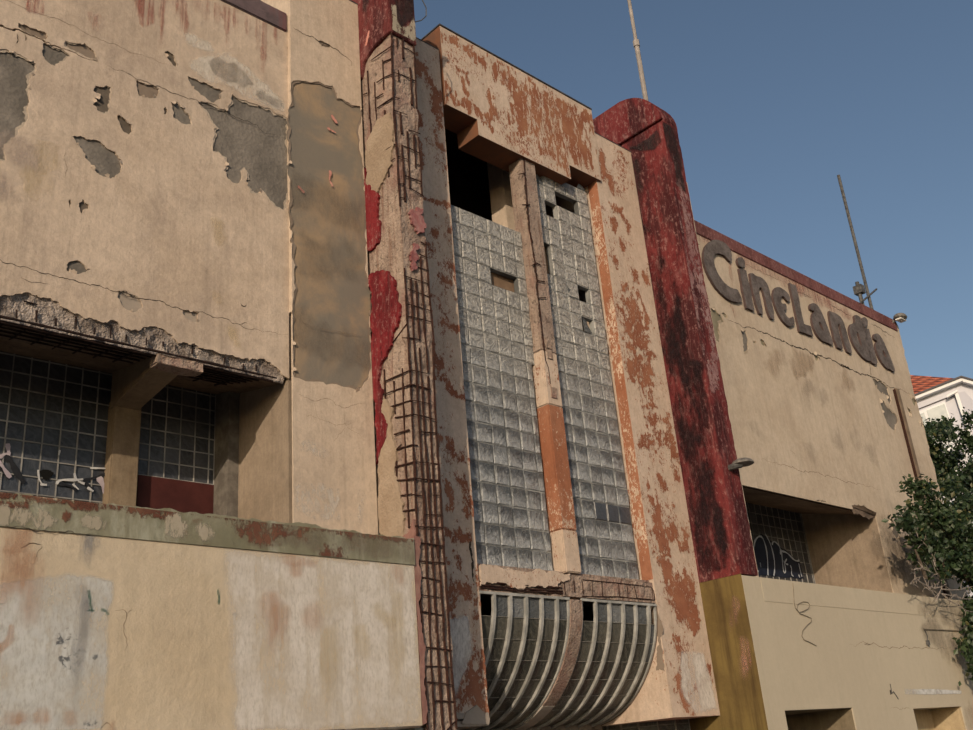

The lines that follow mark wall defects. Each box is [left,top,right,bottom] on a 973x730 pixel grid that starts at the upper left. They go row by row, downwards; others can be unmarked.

water stain [395,0,414,26]
crack [0,0,283,138]
spalling [0,5,701,730]
crack [730,320,907,393]
water stain [649,258,728,570]
rust [0,492,179,522]
rust [225,518,414,558]